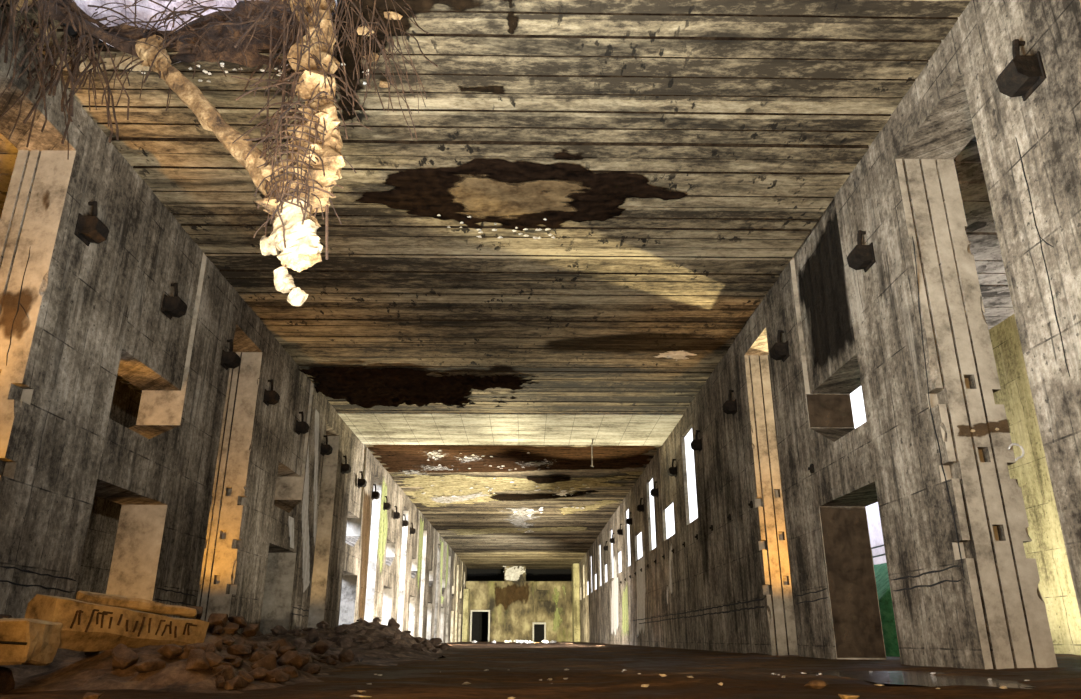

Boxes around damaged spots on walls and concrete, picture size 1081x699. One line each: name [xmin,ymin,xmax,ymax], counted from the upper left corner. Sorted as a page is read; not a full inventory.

spalling [34,0,307,82]
spalling [355,149,688,239]